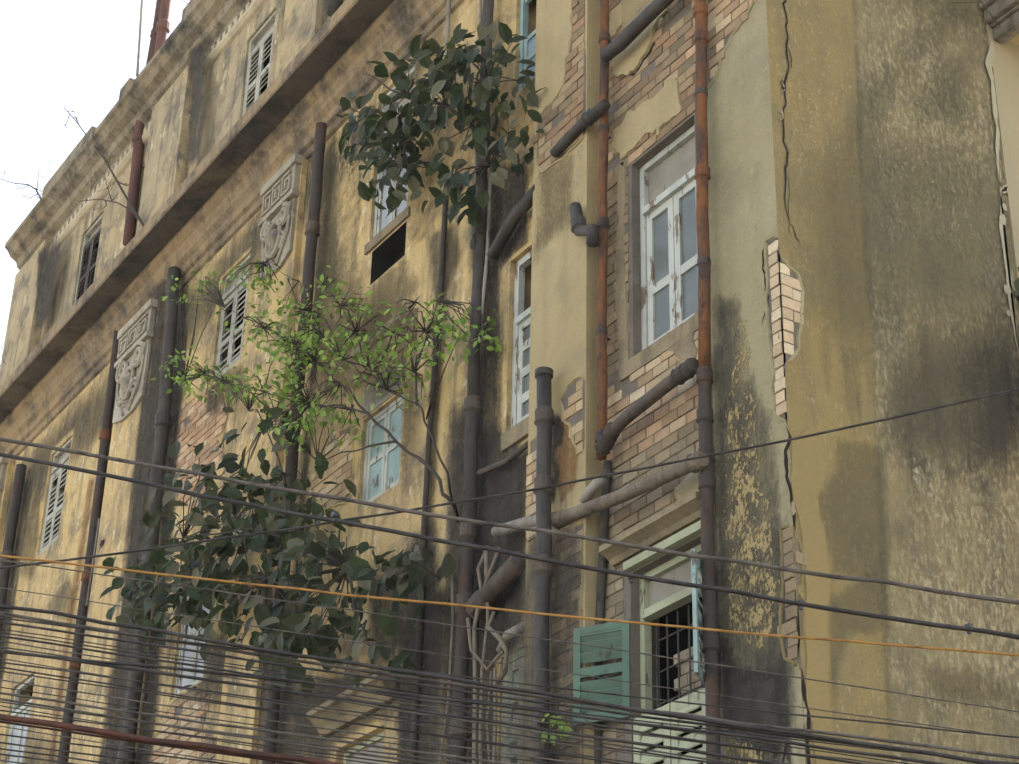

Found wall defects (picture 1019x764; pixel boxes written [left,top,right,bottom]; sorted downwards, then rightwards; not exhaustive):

flaking render [533,0,587,174]
peeling [609,0,648,40]
peeling [611,5,670,78]
flaking render [706,0,756,89]
crack [779,0,800,243]
water stain [35,238,61,331]
flaking render [558,375,585,455]
water stain [714,302,791,764]
peeling [720,319,807,671]
flaking render [764,235,805,426]